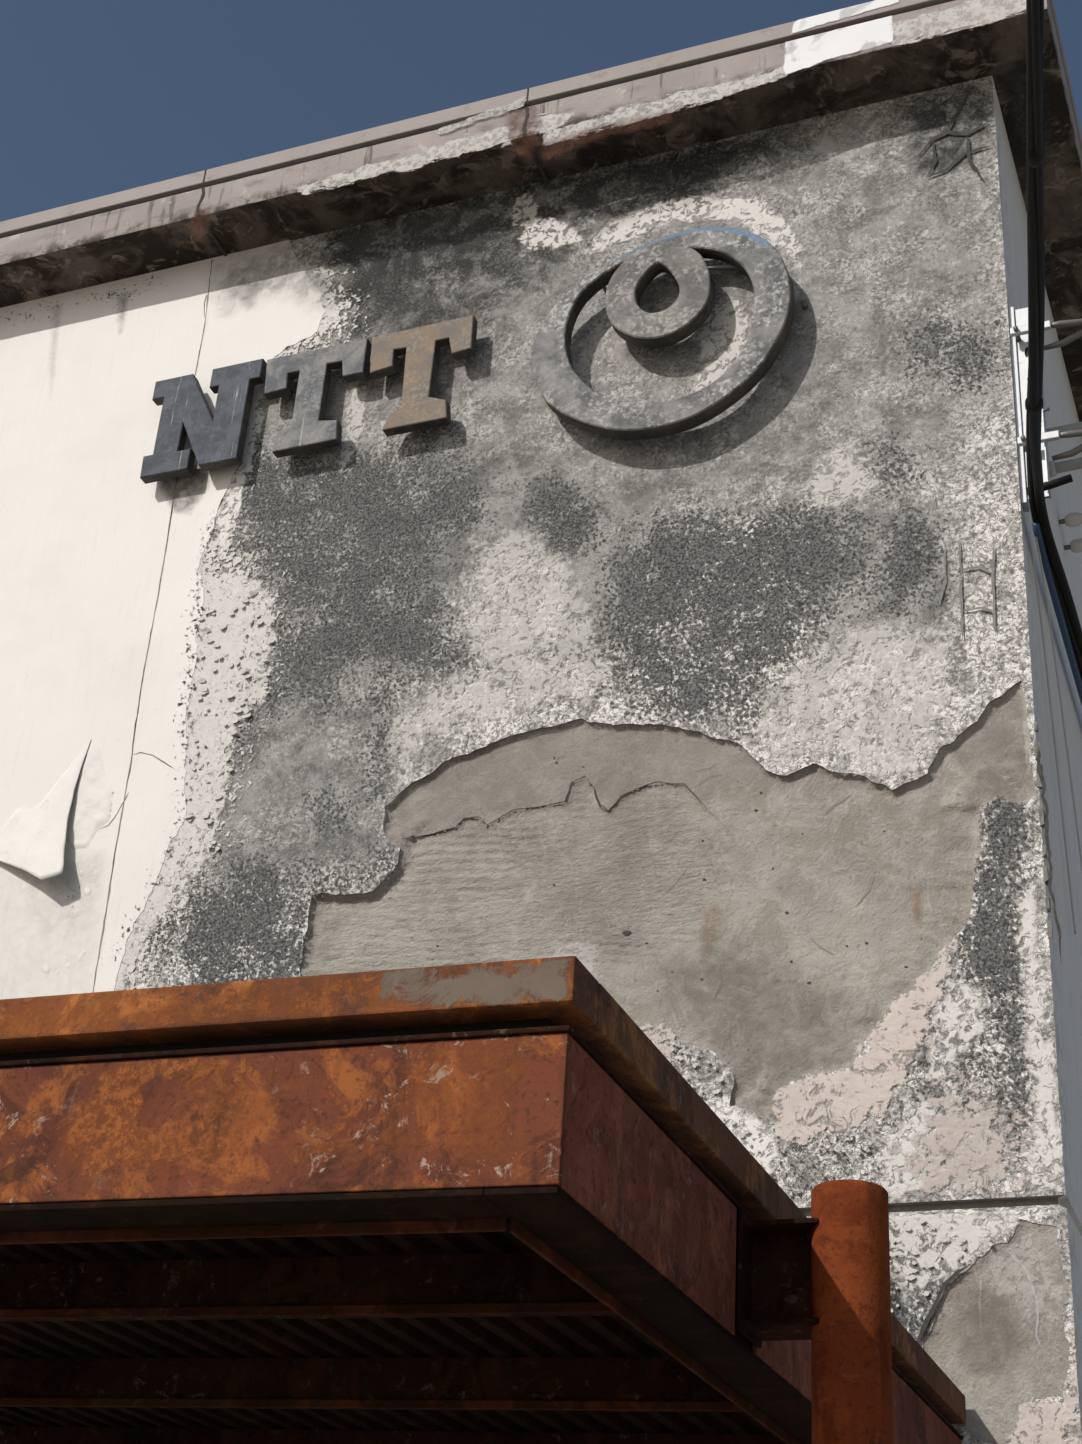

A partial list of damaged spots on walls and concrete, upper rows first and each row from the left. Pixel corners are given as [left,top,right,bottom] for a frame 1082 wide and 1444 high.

peeling [297,66,787,195]
water stain [233,126,803,342]
water stain [694,300,749,391]
mould [890,302,1010,406]
crack [93,479,177,992]
water stain [105,381,969,990]
peeling [0,739,114,880]
spalling [299,680,1062,1152]
corrosion [58,1058,252,1171]
peeling [889,1065,1038,1197]
spalling [890,1217,1082,1444]